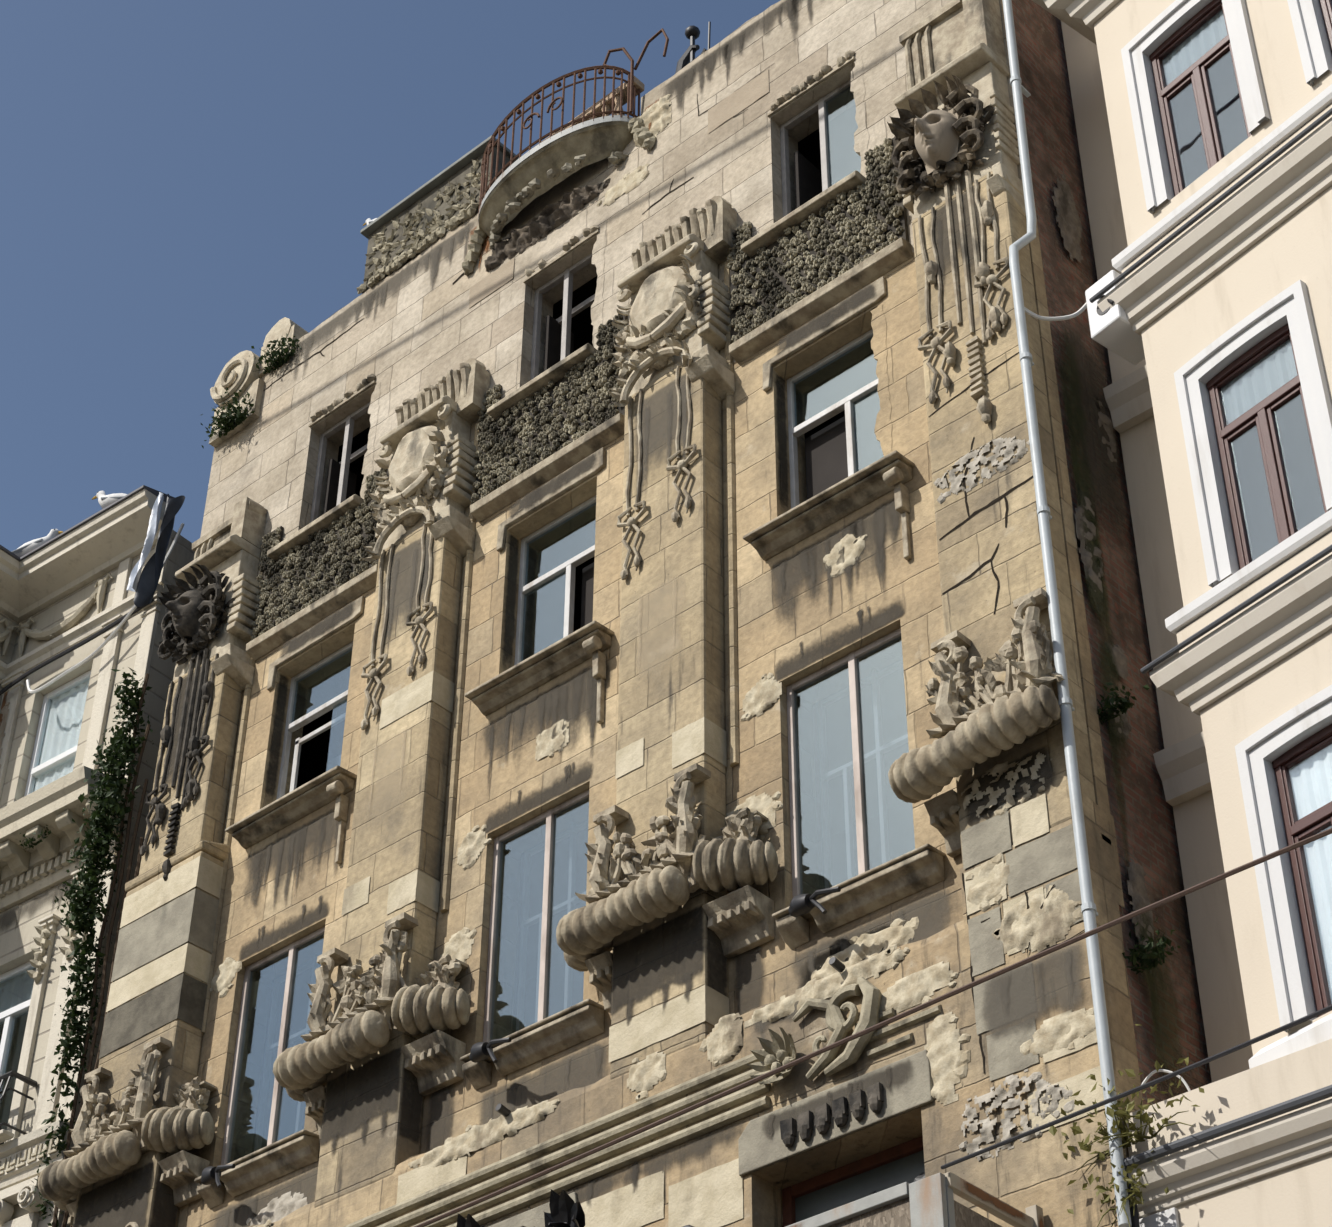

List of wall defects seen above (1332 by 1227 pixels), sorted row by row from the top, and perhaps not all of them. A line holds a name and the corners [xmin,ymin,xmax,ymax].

leakage [666,0,812,107]
spalling [484,164,649,272]
leakage [772,499,901,616]
crack [939,437,1033,614]
leakage [1061,329,1127,639]
leakage [485,664,609,833]
spalling [951,752,1052,818]
leakage [248,810,339,904]
leakage [239,895,328,961]
spalling [699,917,1096,1161]
spalling [408,1098,560,1169]